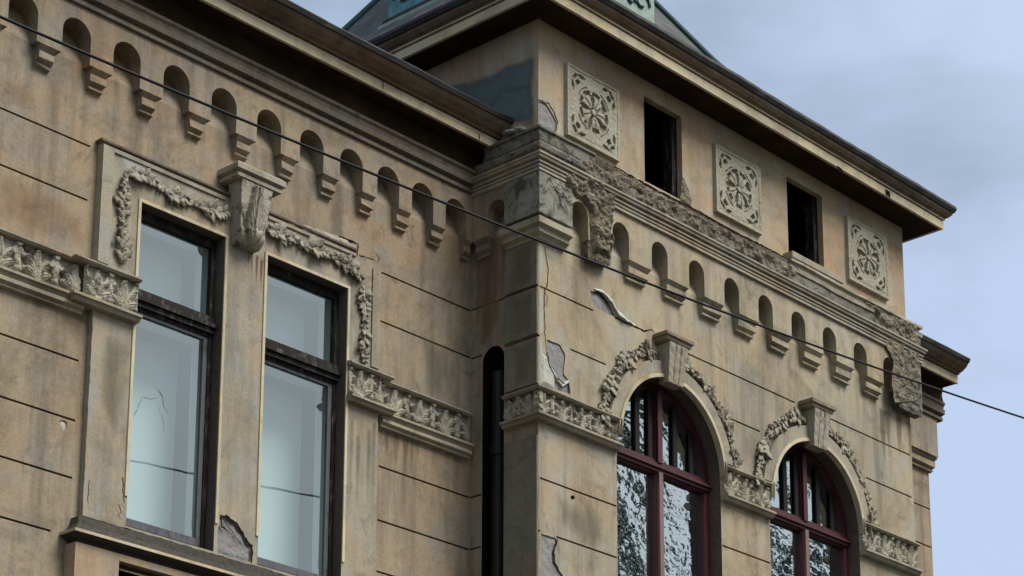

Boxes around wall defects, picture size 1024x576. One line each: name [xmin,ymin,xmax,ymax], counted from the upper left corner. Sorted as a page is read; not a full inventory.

water stain [454,59,533,124]
flaking render [539,99,558,132]
crack [542,246,550,350]
flaking render [540,243,570,394]
flaking render [591,288,655,333]
flaking render [218,514,253,563]
flaking render [541,534,563,576]